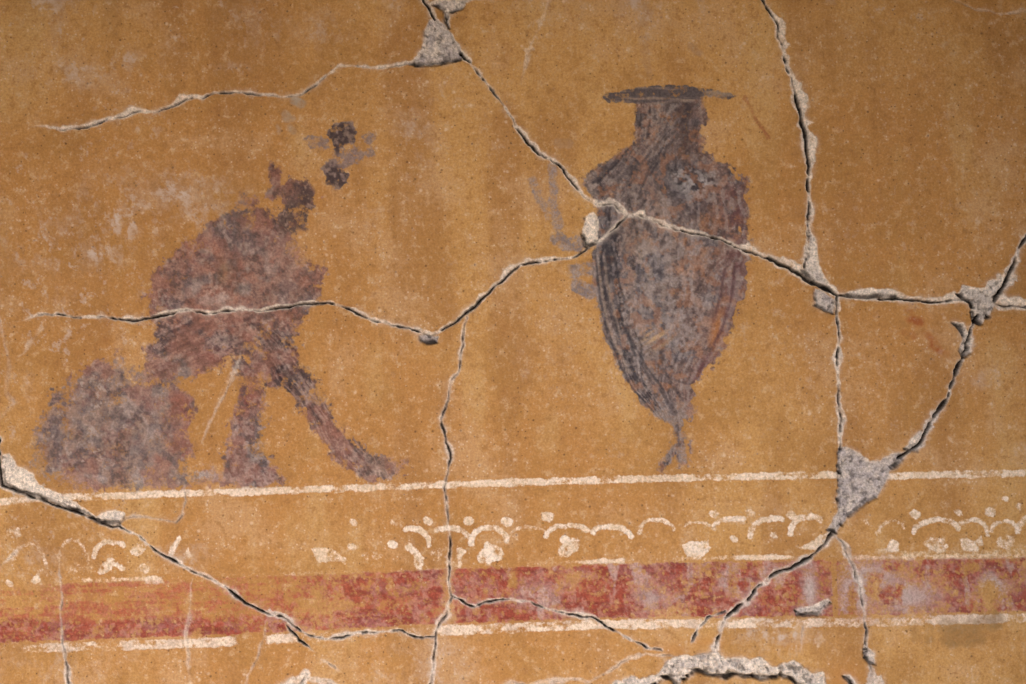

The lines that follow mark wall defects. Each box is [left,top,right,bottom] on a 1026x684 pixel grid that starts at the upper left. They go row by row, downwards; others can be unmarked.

flaking render [408,0,468,68]
crack [951,0,1026,16]
crack [992,231,1026,312]
crack [0,0,820,684]
crack [827,283,967,459]
flaking render [0,452,127,526]
flaking render [824,430,923,535]
crack [689,532,870,651]
flaking render [611,650,829,684]
flaking render [841,674,858,684]
crack [864,665,885,684]